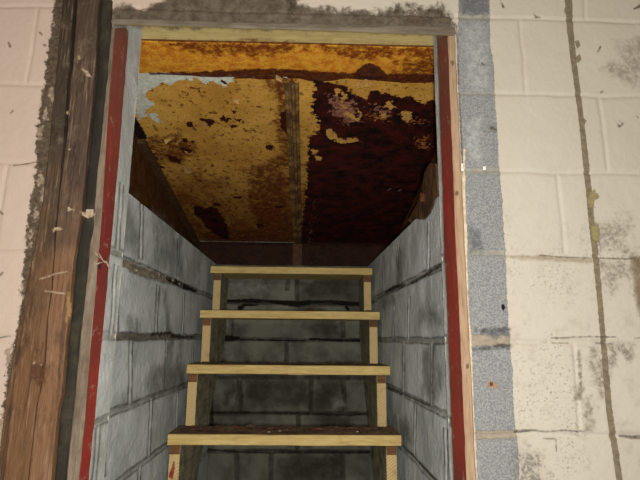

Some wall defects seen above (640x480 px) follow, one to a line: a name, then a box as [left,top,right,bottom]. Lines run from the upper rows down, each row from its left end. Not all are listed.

rust [169,39,295,57]
rust [147,44,437,244]
crack [166,277,197,292]
crack [227,264,442,311]
crack [152,331,195,339]